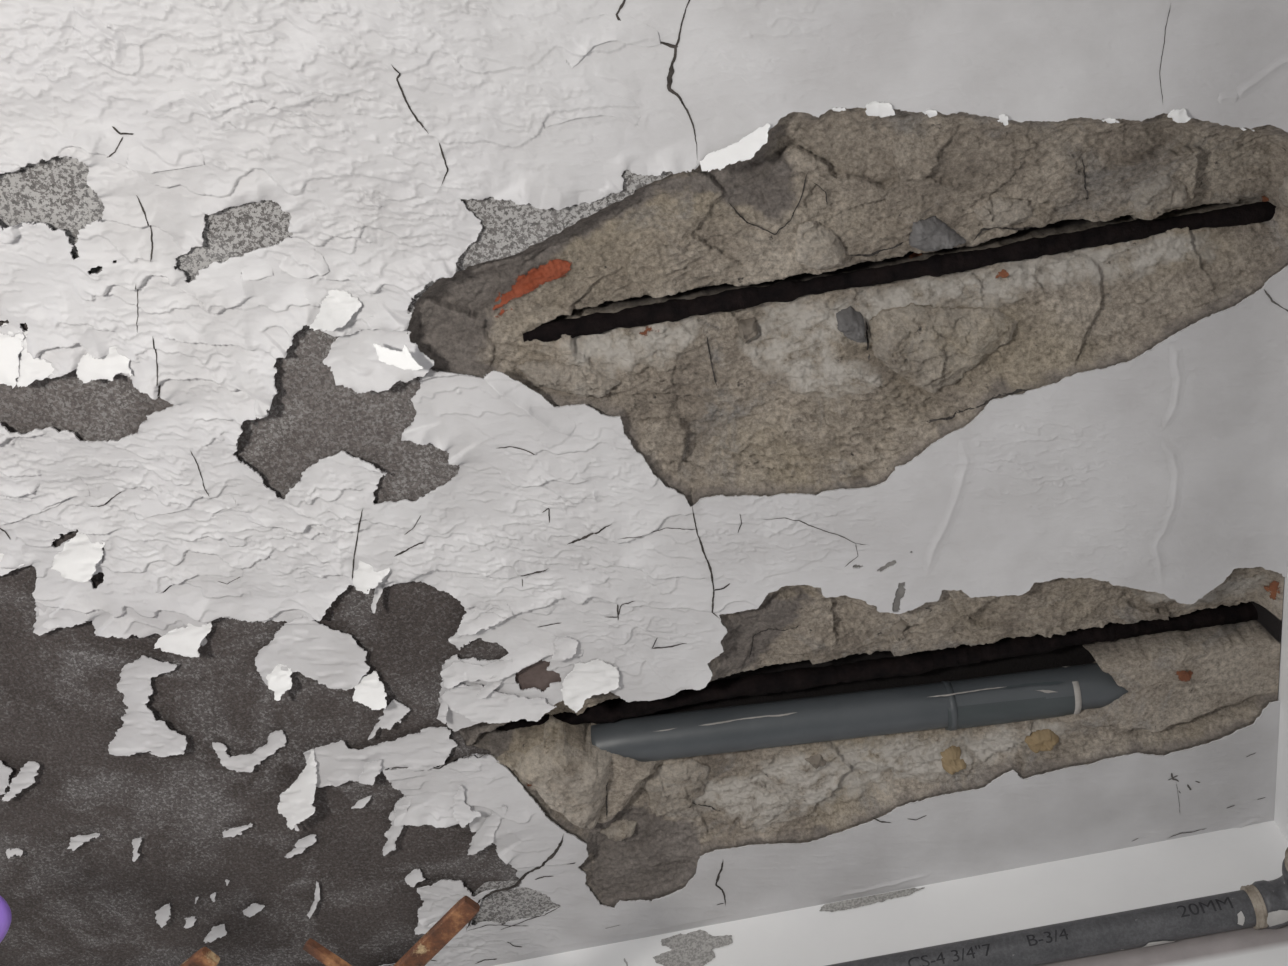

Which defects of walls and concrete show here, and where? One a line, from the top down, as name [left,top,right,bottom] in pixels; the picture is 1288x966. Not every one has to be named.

peeling [563,13,661,68]
crack [616,0,626,21]
crack [660,0,697,151]
crack [1159,5,1171,103]
peeling [0,156,105,259]
peeling [174,200,330,282]
corrosion [493,259,572,317]
spalling [234,101,1288,506]
peeling [0,320,173,442]
peeling [133,490,238,520]
crack [542,506,730,616]
peeling [0,530,1284,966]